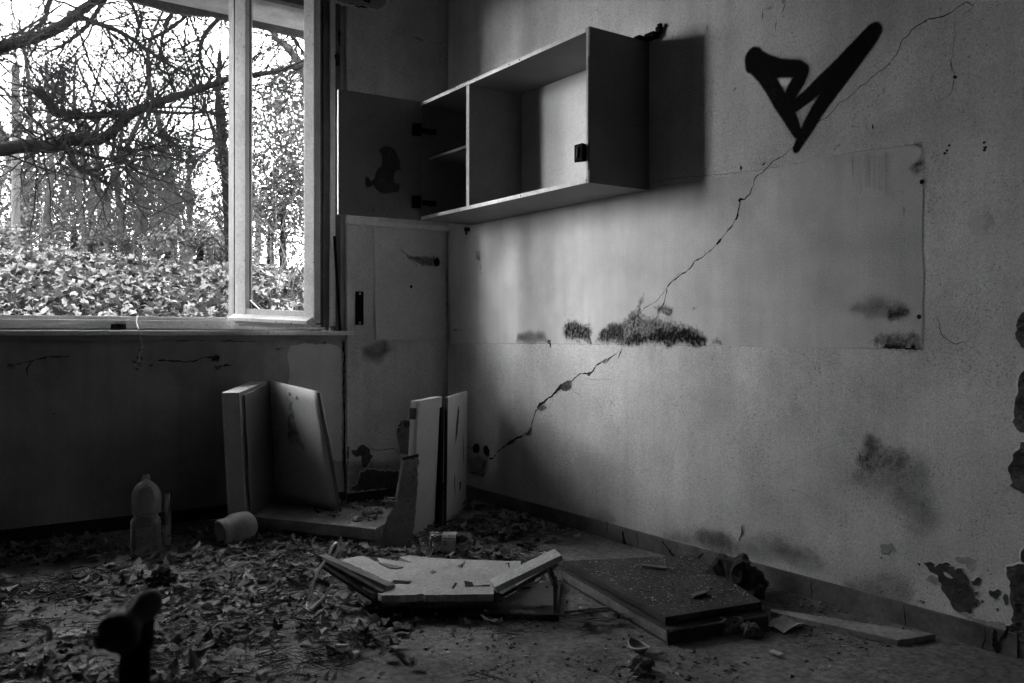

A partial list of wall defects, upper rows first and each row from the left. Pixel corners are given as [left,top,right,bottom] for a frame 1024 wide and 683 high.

crack [489,1,976,460]
water stain [564,300,721,347]
water stain [875,334,920,350]
spalling [1015,310,1024,350]
flaking render [396,418,410,455]
spalling [1007,370,1024,496]
flaking render [345,443,400,492]
flaking render [917,546,1024,644]